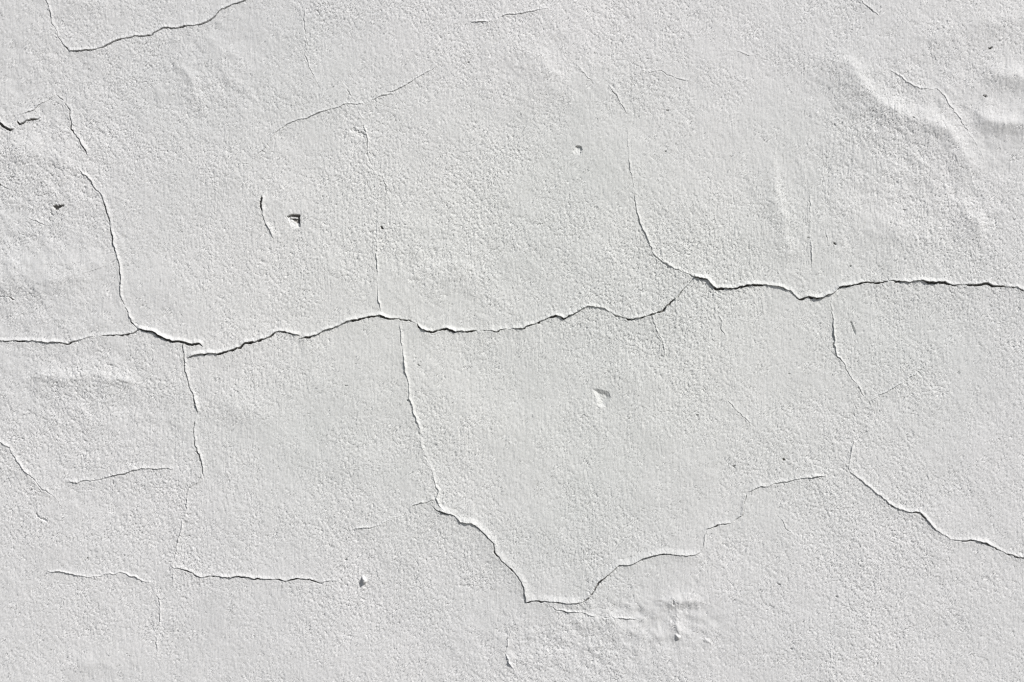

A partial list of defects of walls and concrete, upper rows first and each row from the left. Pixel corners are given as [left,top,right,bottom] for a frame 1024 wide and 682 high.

crack [43,0,249,54]
crack [232,5,445,198]
crack [0,84,1024,586]